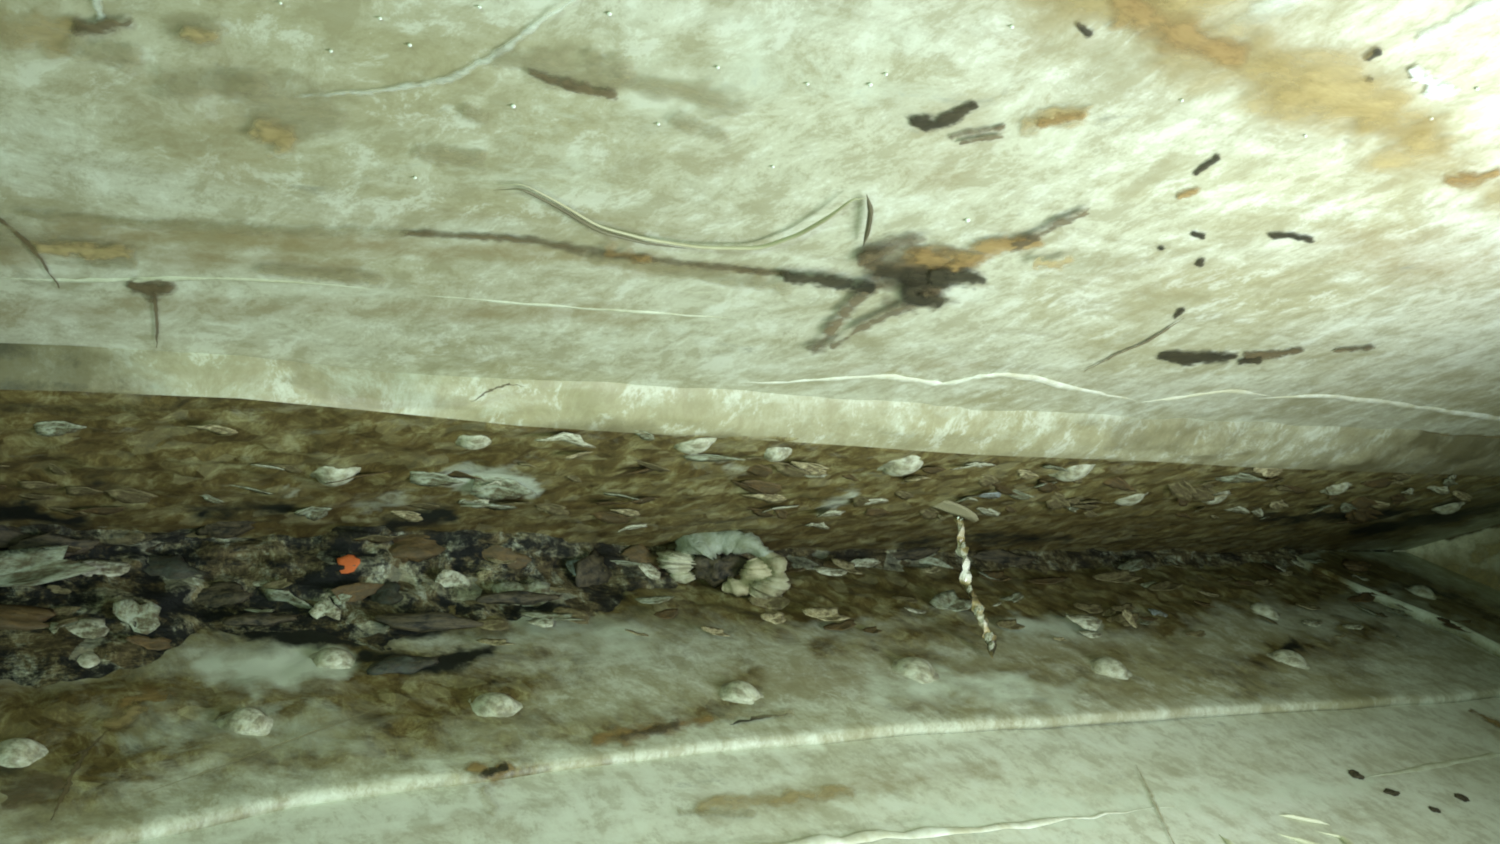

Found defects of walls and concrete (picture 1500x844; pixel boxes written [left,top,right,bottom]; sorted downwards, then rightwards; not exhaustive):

corrosion [1023,108,1088,130]
corrosion [1061,0,1448,169]
corrosion [1446,170,1500,187]
corrosion [405,209,1089,353]
crack [1139,771,1174,844]